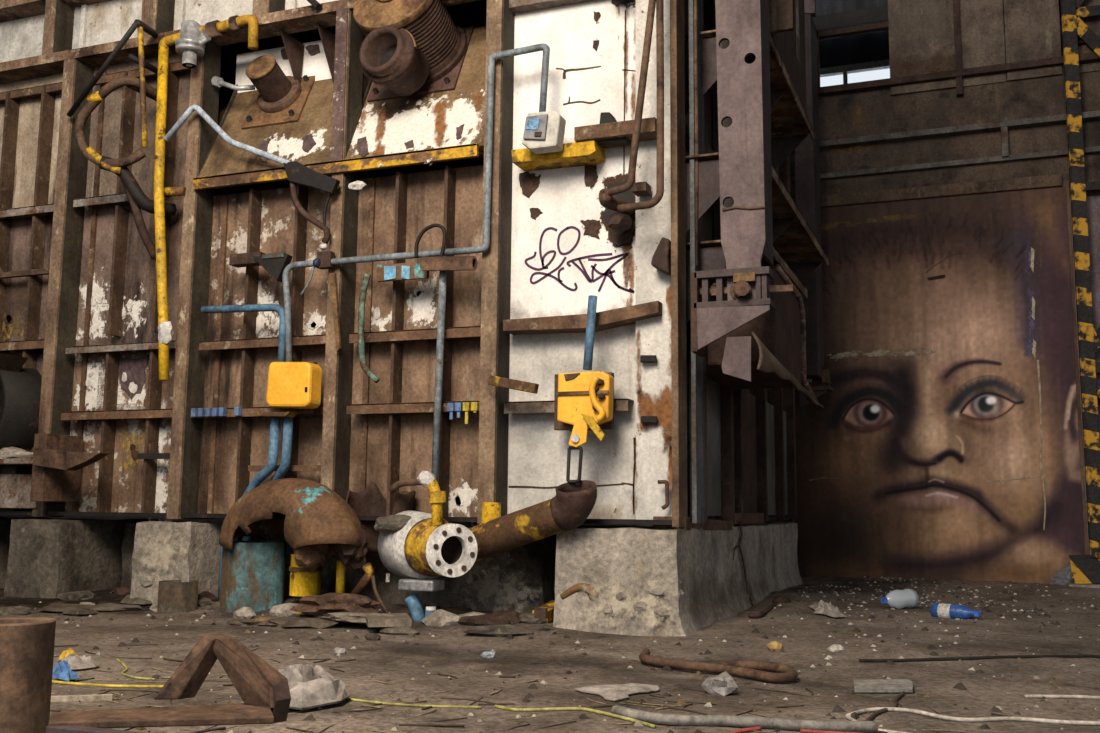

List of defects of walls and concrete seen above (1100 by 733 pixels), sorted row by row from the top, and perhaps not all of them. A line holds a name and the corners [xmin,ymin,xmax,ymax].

peeling [261,127,331,162]
peeling [350,89,485,166]
peeling [76,268,147,340]
peeling [256,292,279,337]
rust [624,250,634,306]
peeling [73,357,105,422]
peeling [117,355,148,410]
rust [636,332,672,494]
peeling [119,422,144,472]
peeling [148,426,172,521]